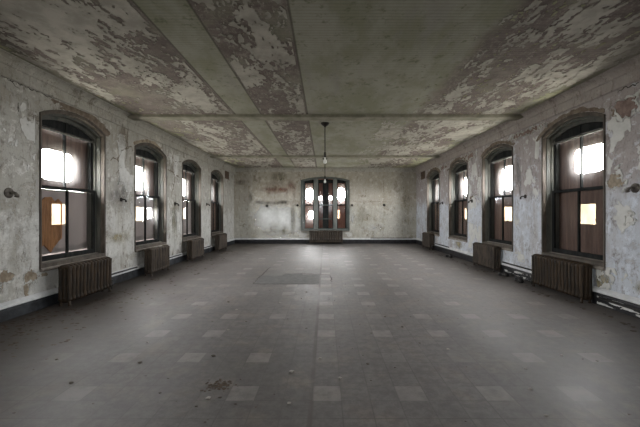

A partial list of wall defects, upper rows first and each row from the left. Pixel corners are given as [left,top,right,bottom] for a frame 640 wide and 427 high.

peeling [0,0,279,168]
peeling [192,0,316,168]
peeling [351,0,640,168]
peeling [605,89,640,193]
spalling [0,268,48,296]